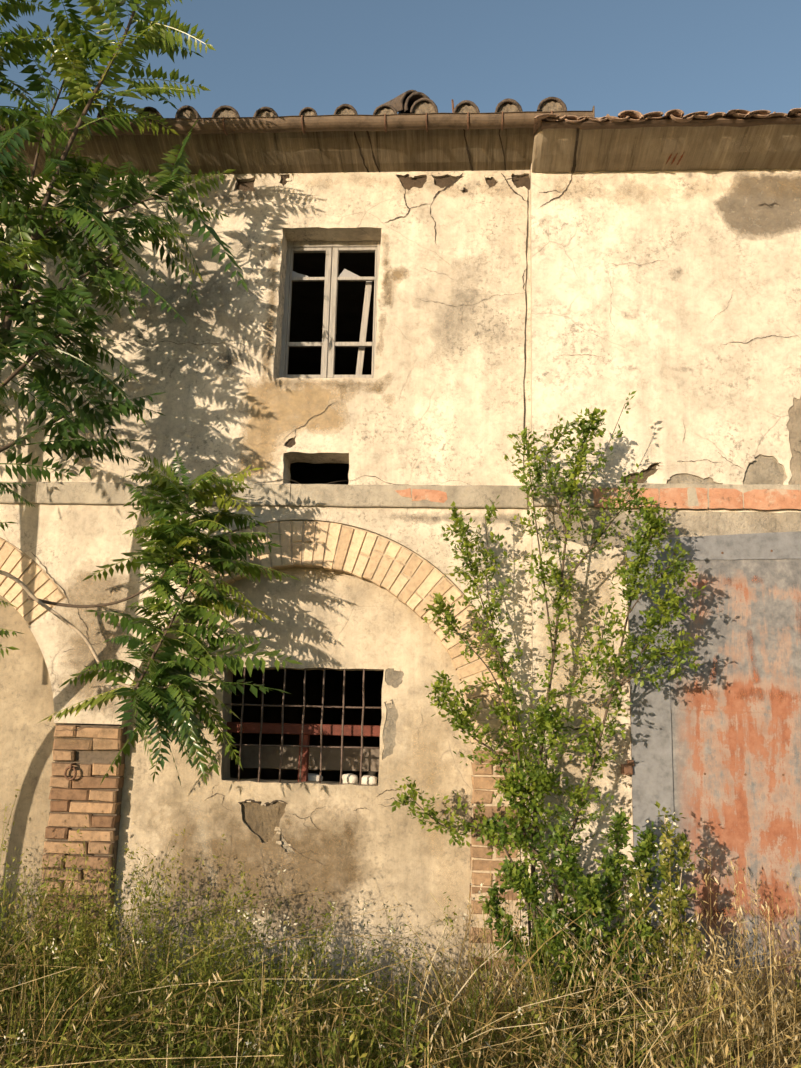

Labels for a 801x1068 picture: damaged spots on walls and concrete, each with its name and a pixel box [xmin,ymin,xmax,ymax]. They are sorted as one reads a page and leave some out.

spalling [236,178,255,192]
crack [382,129,473,243]
spalling [397,173,468,193]
leakage [715,174,801,235]
crack [418,128,580,429]
spalling [592,397,801,510]
spalling [395,488,447,503]
spalling [241,798,295,853]